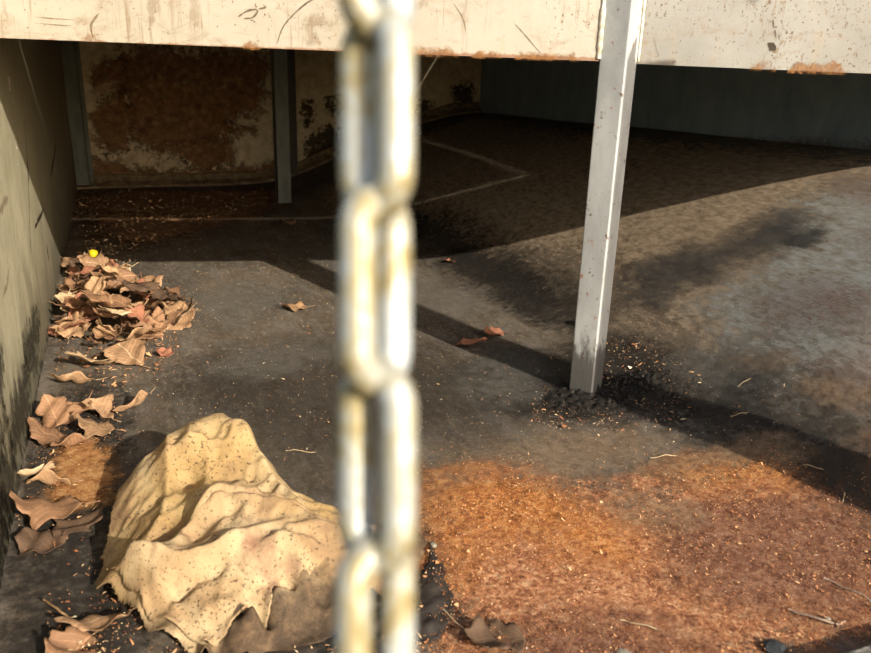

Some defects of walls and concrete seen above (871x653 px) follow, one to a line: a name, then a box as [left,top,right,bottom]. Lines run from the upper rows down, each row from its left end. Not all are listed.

corrosion [788,63,842,73]
leakage [0,305,48,588]